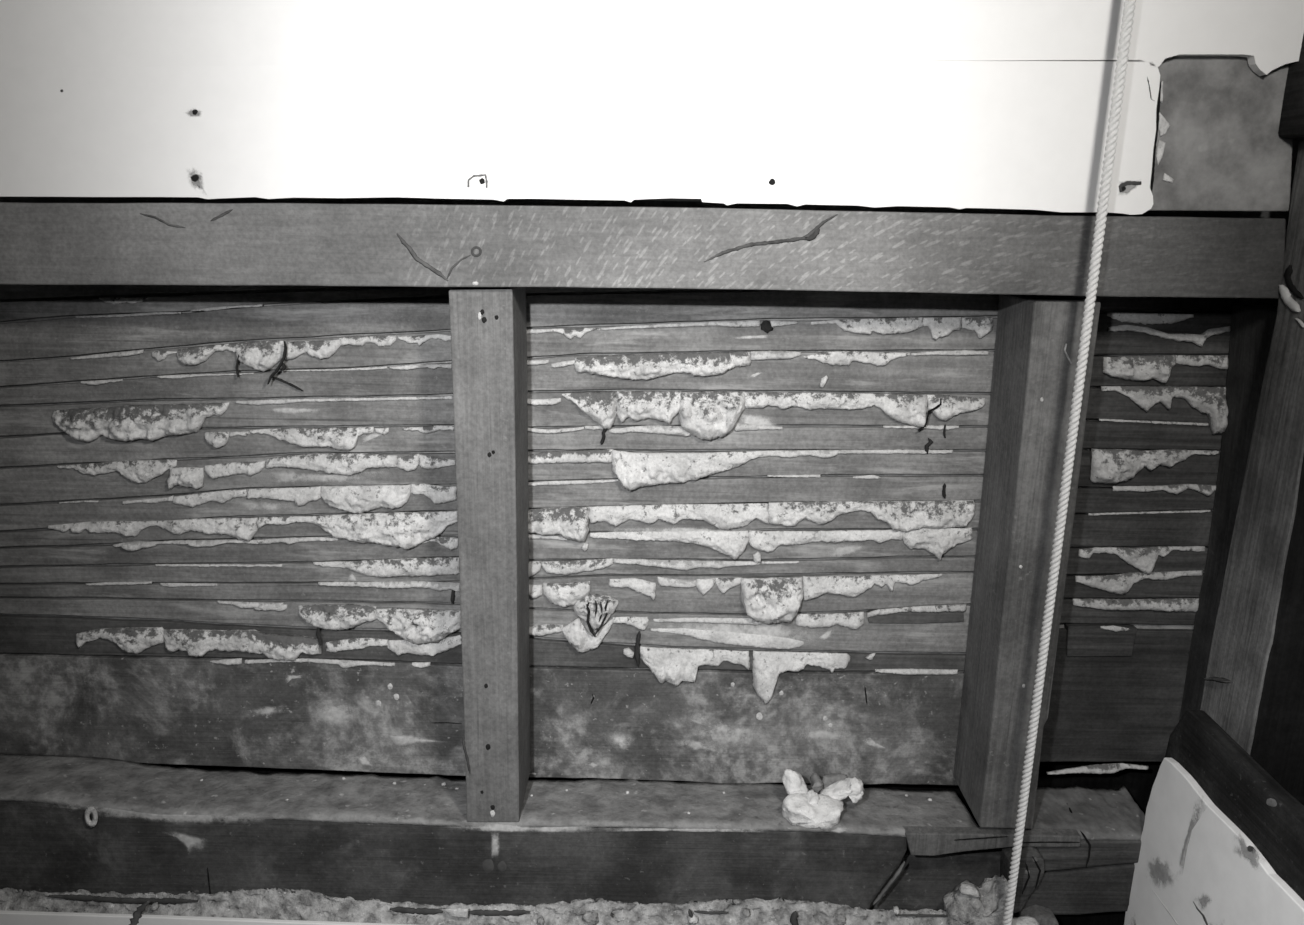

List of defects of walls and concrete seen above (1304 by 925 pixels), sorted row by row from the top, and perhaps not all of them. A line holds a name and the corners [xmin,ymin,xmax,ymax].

crack [397,233,471,281]
crack [704,214,838,262]
water stain [1150,808,1200,883]
crack [129,901,150,925]